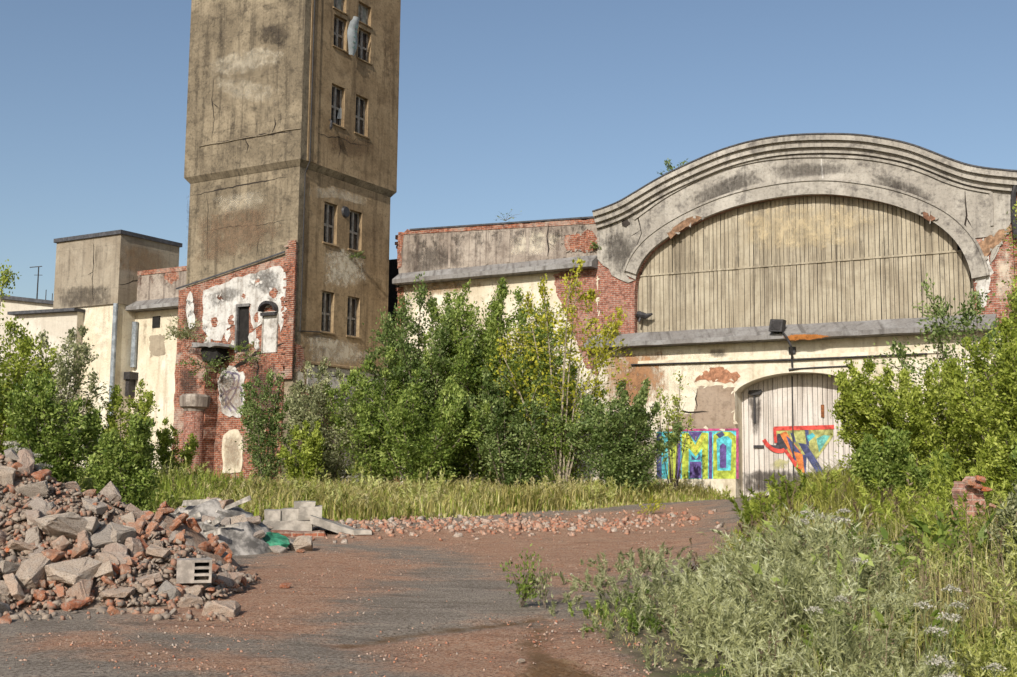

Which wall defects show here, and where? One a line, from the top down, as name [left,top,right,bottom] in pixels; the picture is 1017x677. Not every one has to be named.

crack [211,79,290,153]
spalling [561,229,599,254]
spalling [664,212,704,239]
crack [964,195,972,227]
spalling [974,225,1012,307]
peeling [186,266,287,351]
spalling [551,265,601,375]
peeling [217,366,245,474]
spalling [672,364,740,431]